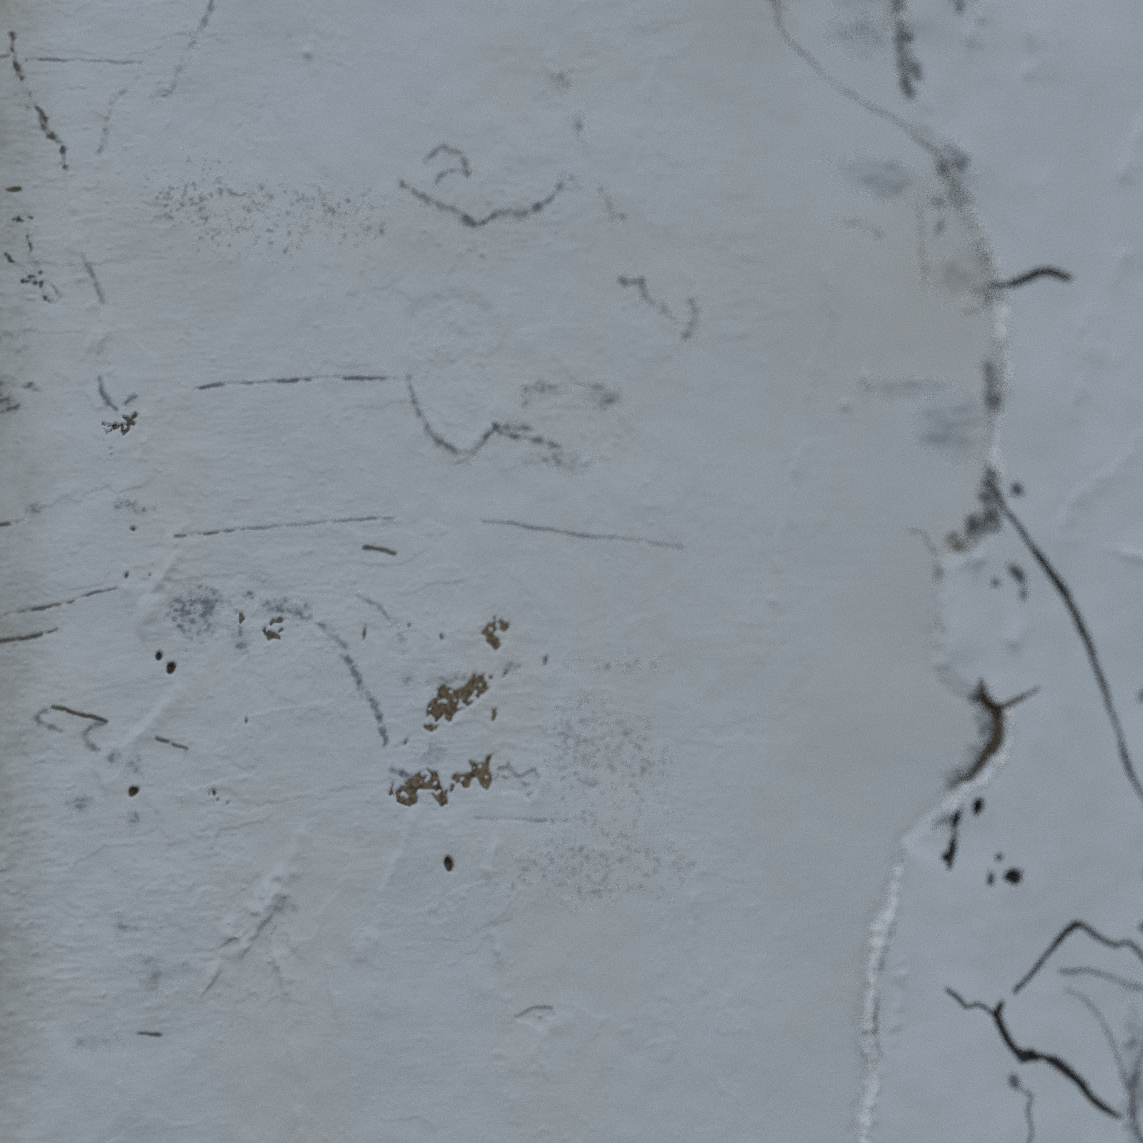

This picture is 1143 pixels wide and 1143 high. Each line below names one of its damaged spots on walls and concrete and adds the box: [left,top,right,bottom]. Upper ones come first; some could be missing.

crack [988,269,1073,287]
peeling [987,300,1023,497]
spalling [423,617,524,743]
peeling [942,708,1014,870]
crack [958,679,1040,783]
spalling [1010,567,1025,598]
crack [986,481,1143,798]
spalling [988,855,1021,886]
peeling [857,861,903,1143]
crack [946,922,1143,1143]